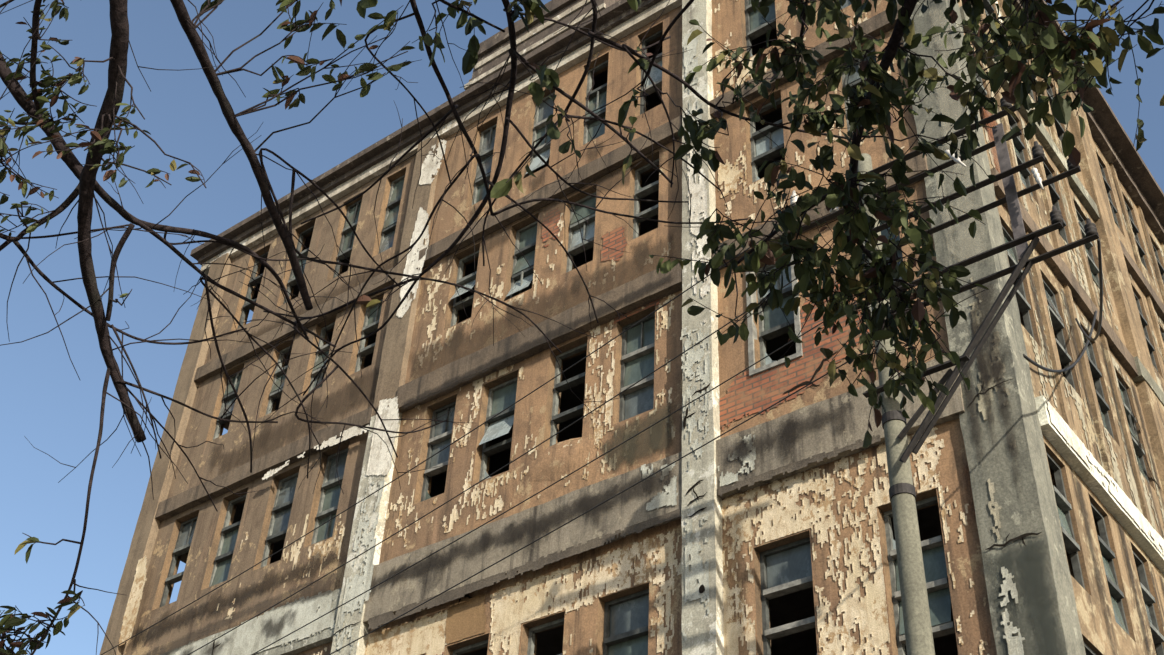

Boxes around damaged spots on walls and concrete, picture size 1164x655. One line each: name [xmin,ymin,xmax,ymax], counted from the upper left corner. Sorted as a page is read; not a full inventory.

peeling [396,207,564,351]
peeling [687,142,785,298]
leakage [1028,258,1047,354]
leakage [963,284,1017,456]
leakage [370,468,672,591]
peeling [173,280,890,655]
leakage [603,405,672,469]
leakage [726,412,842,462]
peeling [907,427,969,589]
peeling [119,556,147,646]
leakage [133,553,336,655]
peeling [999,566,1025,655]